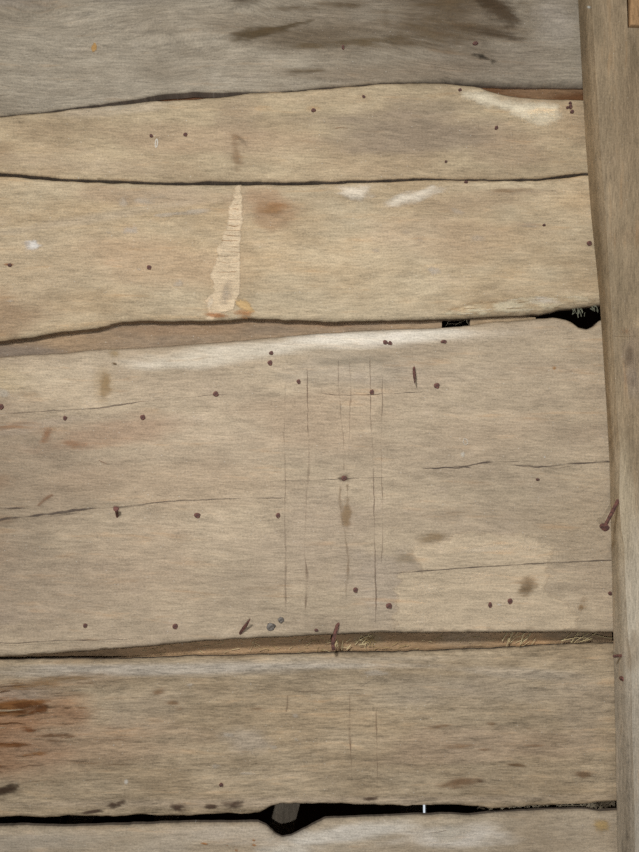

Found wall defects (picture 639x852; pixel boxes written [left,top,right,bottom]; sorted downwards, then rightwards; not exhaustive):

crack [424,461,488,469]
crack [512,460,609,468]
crack [0,507,94,520]
crack [401,560,608,573]
rust [0,682,67,741]